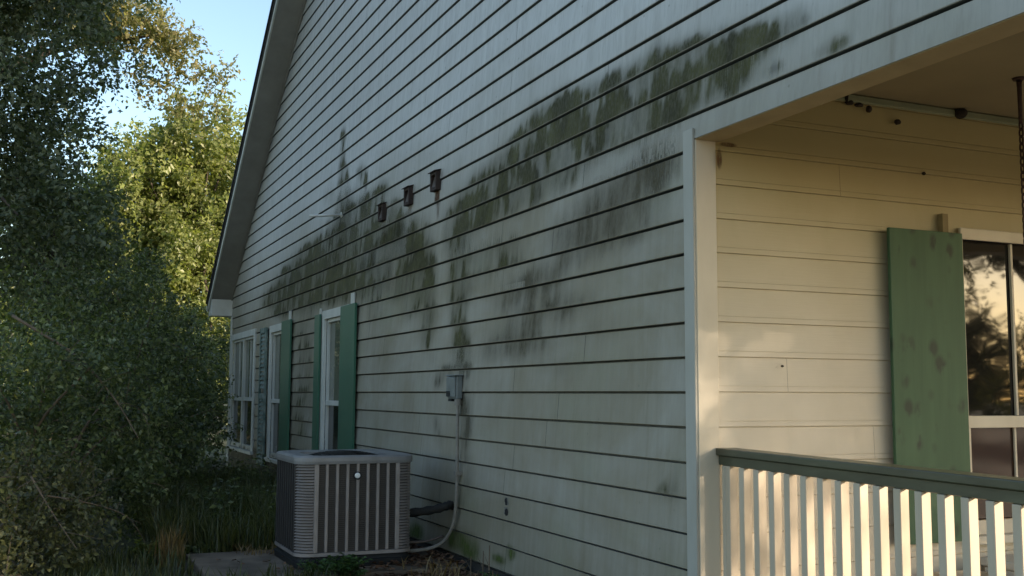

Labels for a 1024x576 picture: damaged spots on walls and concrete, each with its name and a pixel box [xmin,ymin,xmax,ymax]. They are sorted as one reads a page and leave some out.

damp [264,131,435,316]
damp [436,21,780,384]